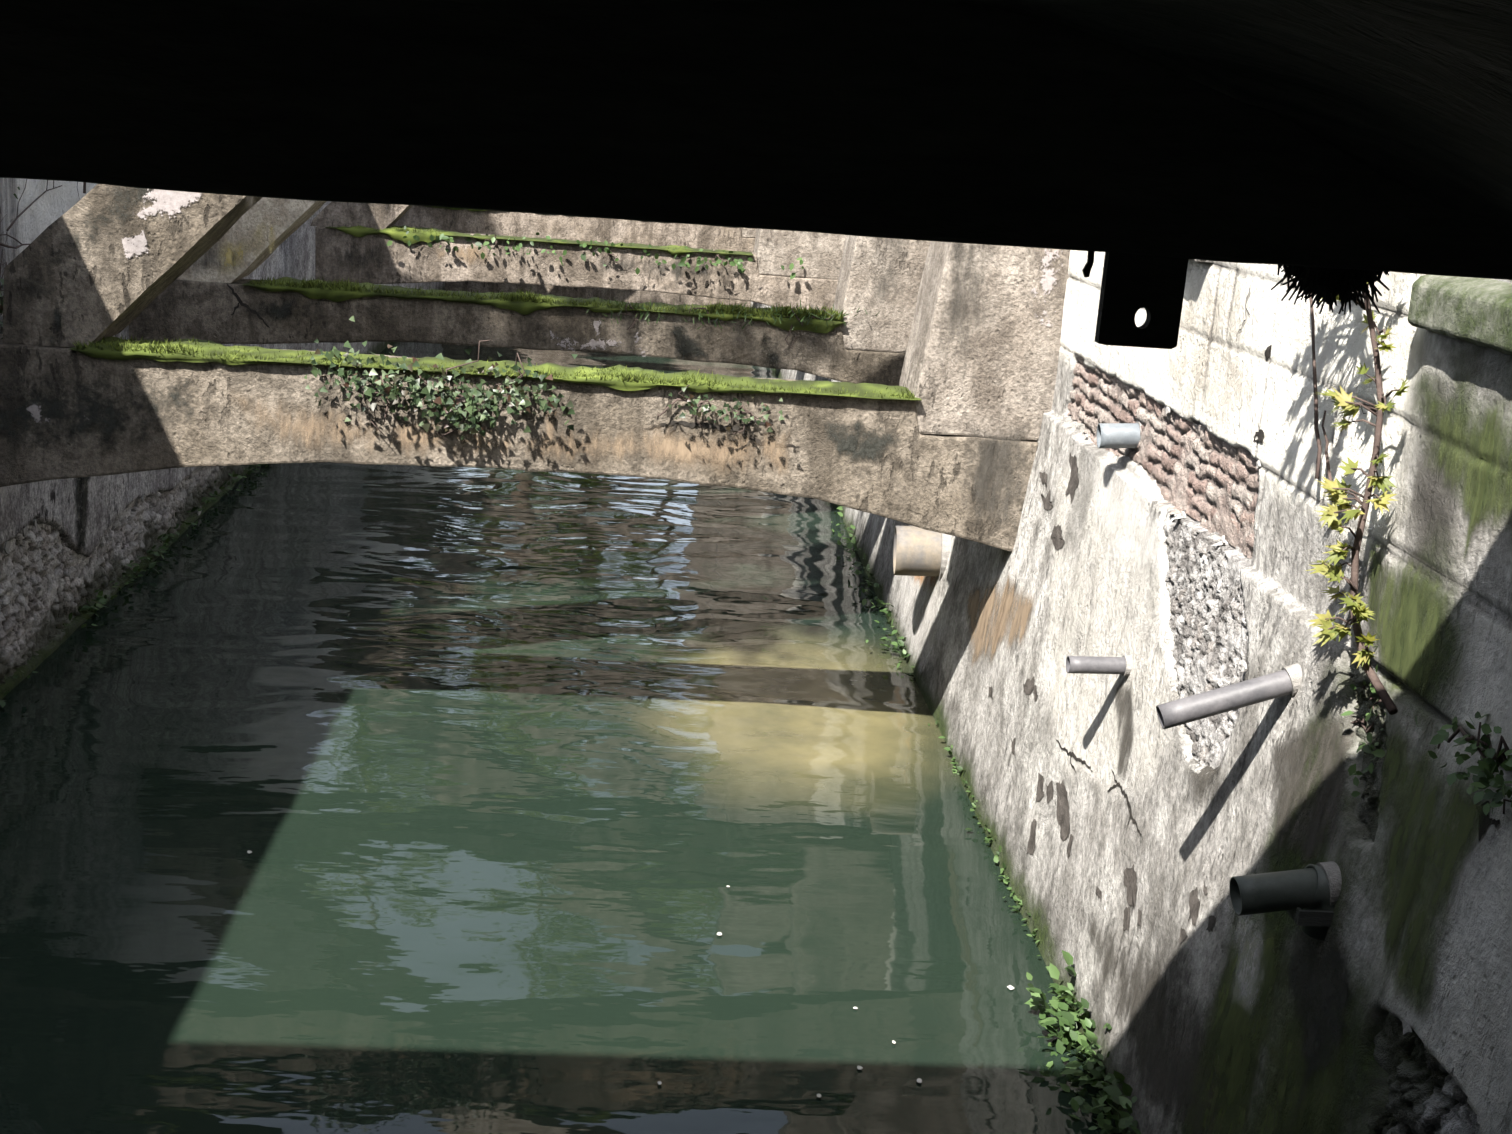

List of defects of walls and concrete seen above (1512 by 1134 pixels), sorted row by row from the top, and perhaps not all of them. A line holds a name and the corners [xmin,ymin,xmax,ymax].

spalling [0,465,249,685]
spalling [1039,357,1264,699]
damp [1466,410,1496,551]
crack [1056,740,1141,835]
spalling [1183,708,1240,769]
spalling [1373,1013,1481,1134]